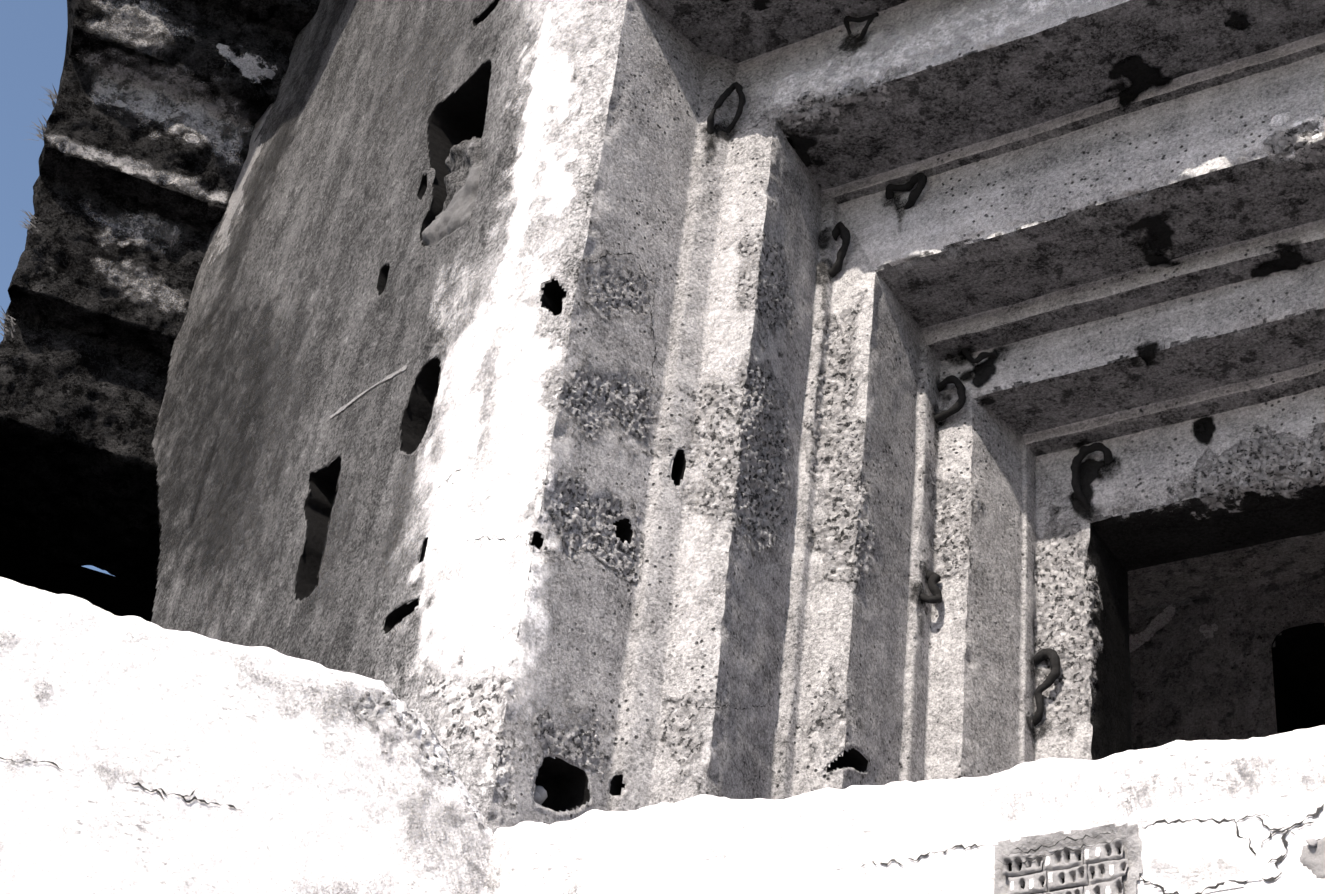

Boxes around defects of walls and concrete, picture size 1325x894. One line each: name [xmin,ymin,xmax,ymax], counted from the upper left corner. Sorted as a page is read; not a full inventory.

rust [883,194,904,232]
rust [947,346,1010,405]
peeling [339,0,876,837]
rust [932,381,950,453]
rust [1069,442,1120,525]
spalling [1113,423,1325,520]
crack [0,757,64,771]
crack [122,782,242,811]
crack [1139,803,1325,894]
flaking render [1299,837,1325,879]